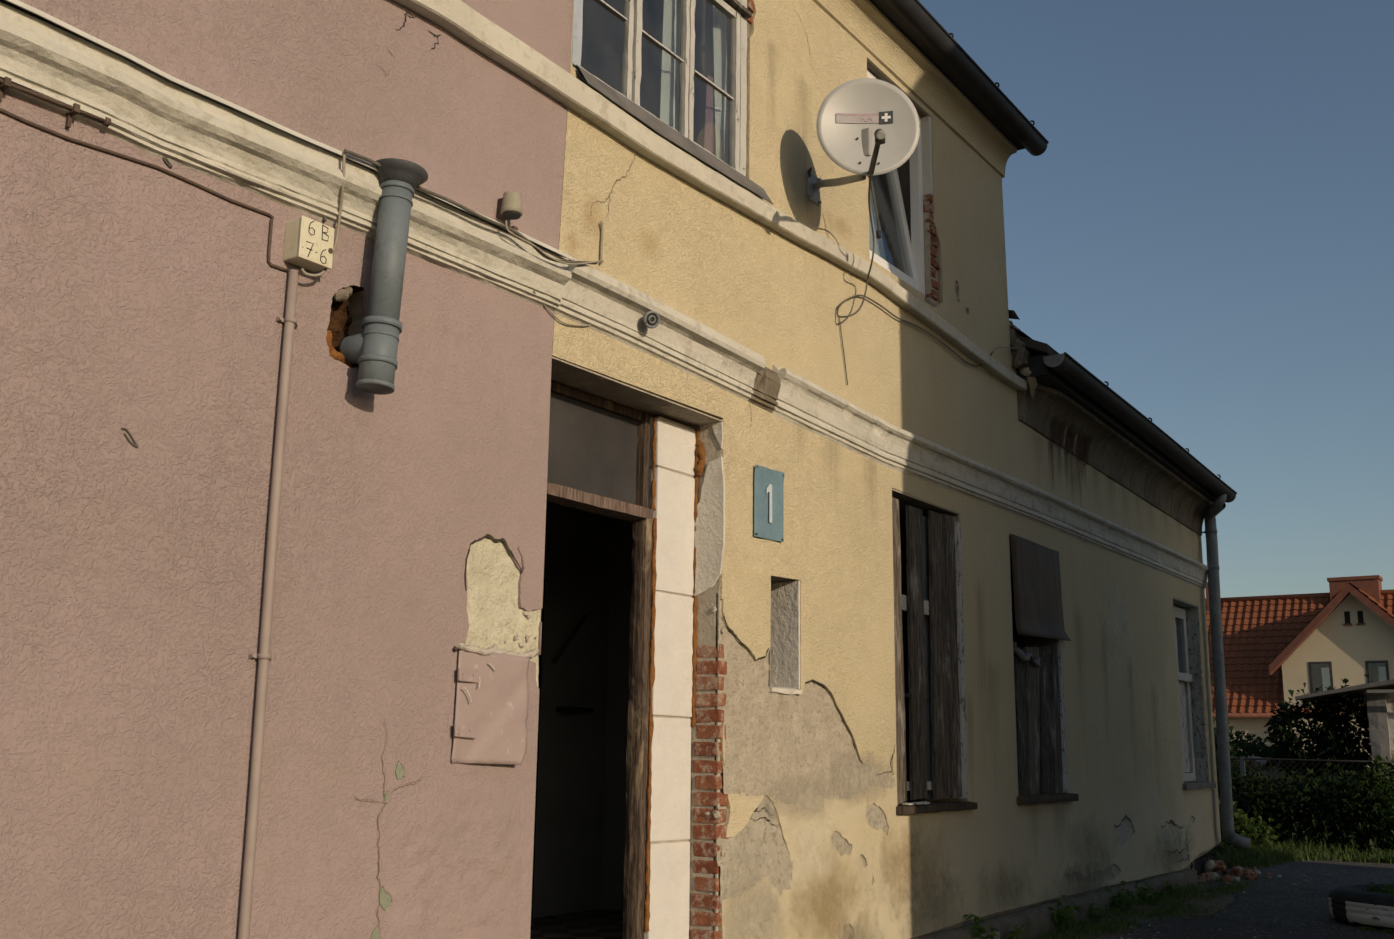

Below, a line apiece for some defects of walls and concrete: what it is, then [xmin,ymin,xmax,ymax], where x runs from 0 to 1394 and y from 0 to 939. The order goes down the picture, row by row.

crack [589,154,637,218]
flaking render [464,534,541,686]
flaking render [716,609,895,904]